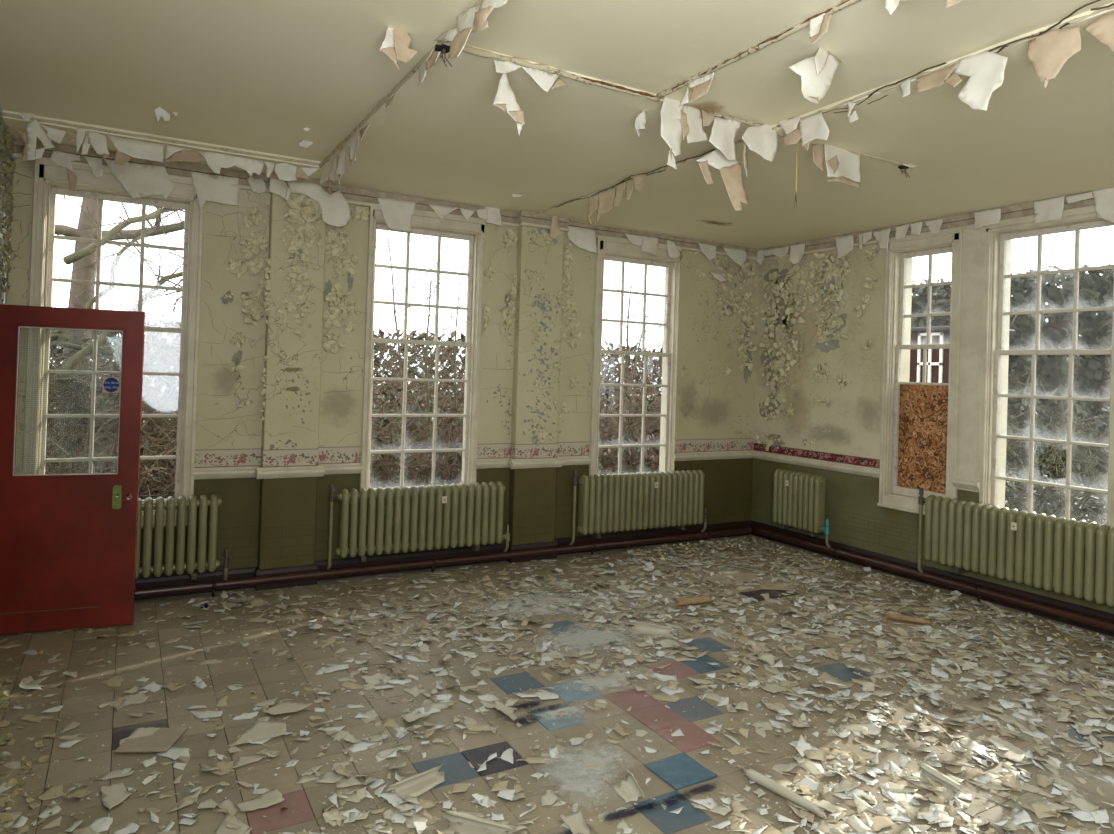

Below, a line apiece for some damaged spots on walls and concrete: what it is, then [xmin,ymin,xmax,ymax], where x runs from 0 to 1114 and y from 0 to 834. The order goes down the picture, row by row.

peeling [154,107,177,122]
peeling [493,60,567,137]
peeling [635,13,861,211]
peeling [899,52,1008,111]
peeling [1027,13,1114,88]
peeling [0,113,518,353]
peeling [536,174,645,254]
peeling [973,209,1001,230]
peeling [1034,187,1114,223]
peeling [483,270,561,447]
peeling [624,219,943,451]